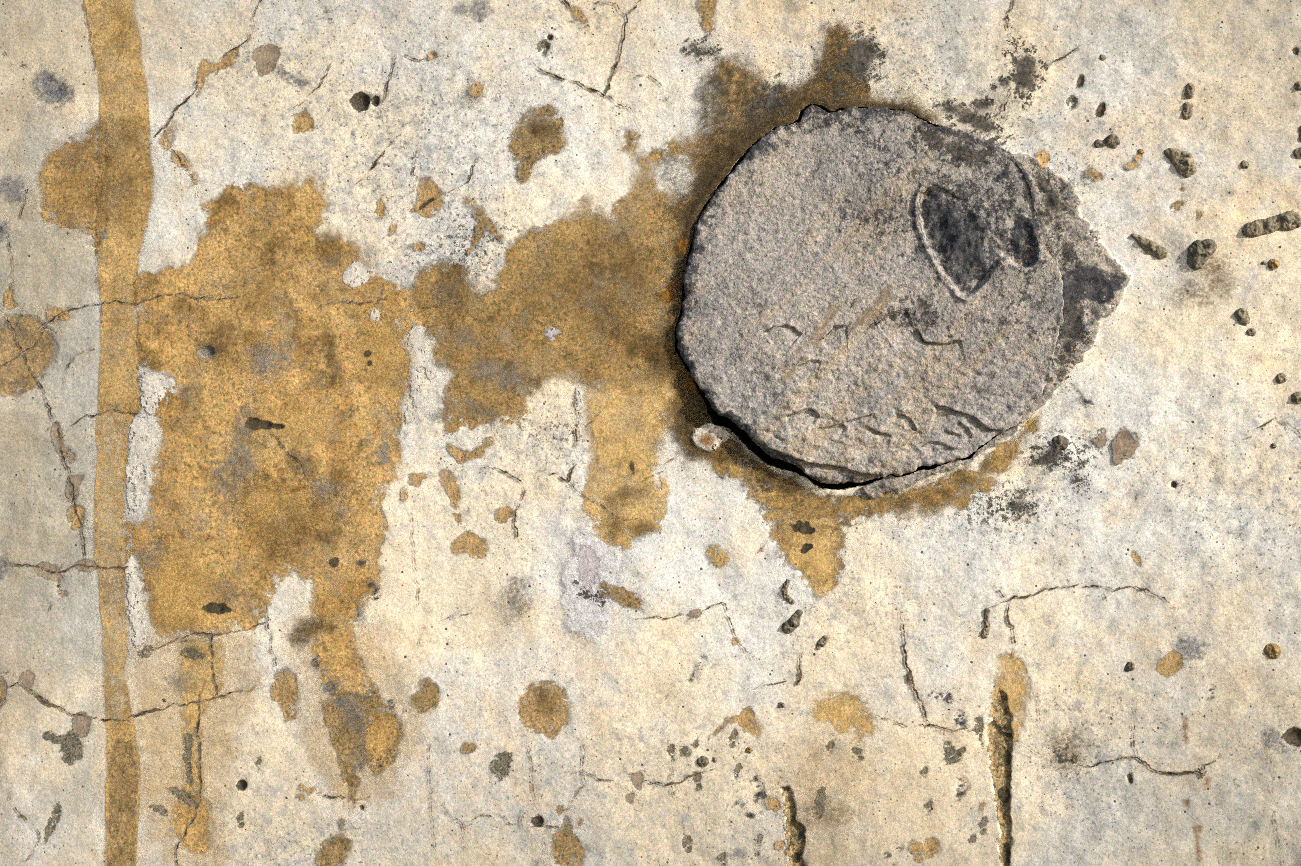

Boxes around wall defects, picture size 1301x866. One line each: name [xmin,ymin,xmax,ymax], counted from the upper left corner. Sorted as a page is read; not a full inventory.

crack [83,2,96,74]
crack [139,0,263,196]
crack [295,63,331,106]
crack [356,54,449,192]
crack [531,0,672,119]
crack [1005,0,1016,54]
crack [1040,42,1093,84]
crack [0,120,248,610]
crack [988,584,1176,659]
crack [1,602,279,865]
spalling [987,652,1029,866]
crack [878,603,1223,779]